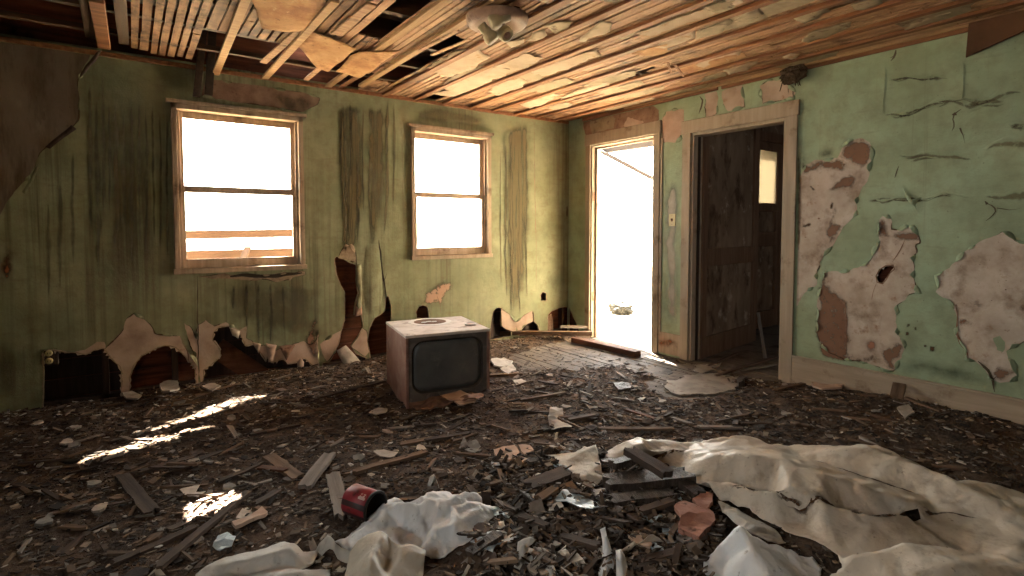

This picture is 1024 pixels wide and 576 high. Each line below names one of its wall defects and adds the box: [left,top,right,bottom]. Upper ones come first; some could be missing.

peeling [661,108,684,143]
peeling [704,85,745,117]
peeling [759,78,796,104]
crack [952,62,965,142]
damp [340,106,395,250]
damp [500,128,528,305]
peeling [797,138,922,373]
spalling [42,244,392,408]
peeling [416,283,451,319]
spalling [490,292,579,340]
peeling [934,231,1024,383]